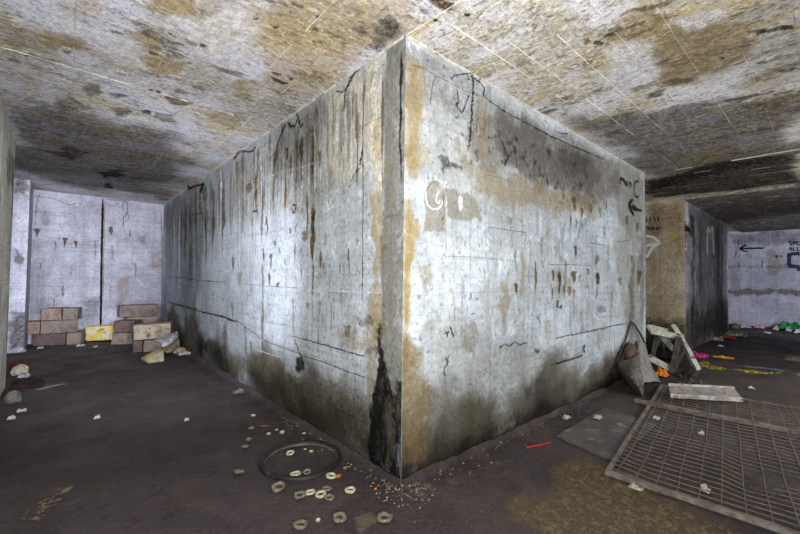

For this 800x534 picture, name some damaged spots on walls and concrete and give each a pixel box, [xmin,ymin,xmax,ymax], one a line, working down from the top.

leakage [12,110,186,193]
rust [236,122,333,293]
crack [274,112,303,167]
crack [336,69,381,300]
crack [411,65,605,162]
leakage [610,43,660,90]
leakage [596,91,800,198]
rust [261,252,279,361]
rust [514,253,543,294]
rust [552,246,609,309]
leakage [250,339,350,430]
leakage [366,326,622,485]